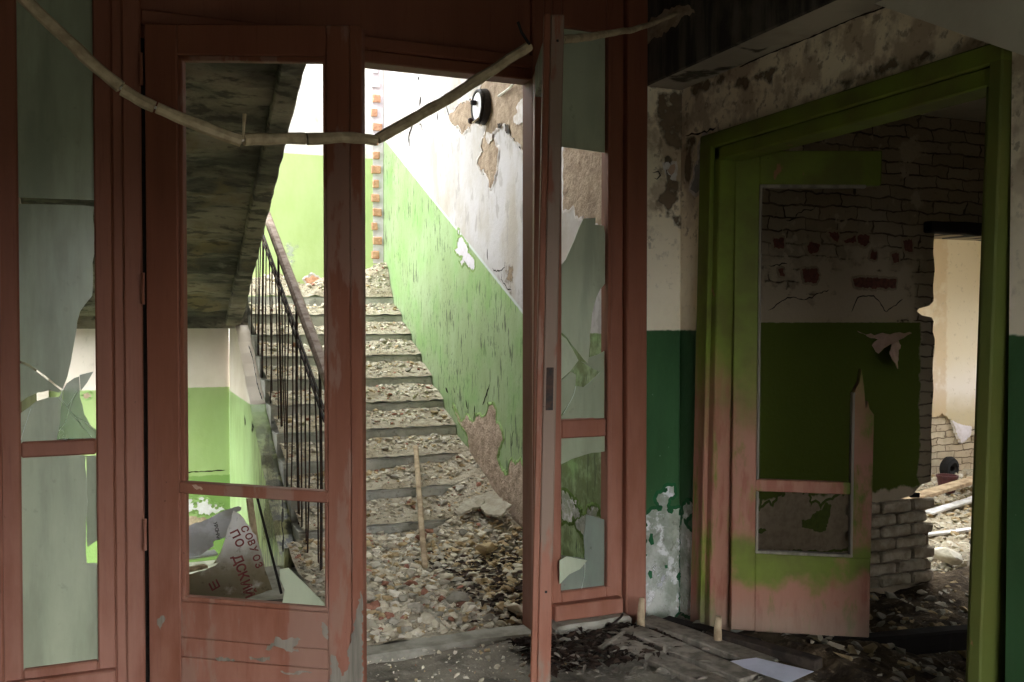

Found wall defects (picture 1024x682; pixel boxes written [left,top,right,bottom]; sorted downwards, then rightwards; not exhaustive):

spalling [437,81,523,191]
spalling [562,147,602,225]
water stain [657,66,776,226]
peeling [452,401,523,529]
peeling [950,420,972,444]
peeling [646,483,693,620]